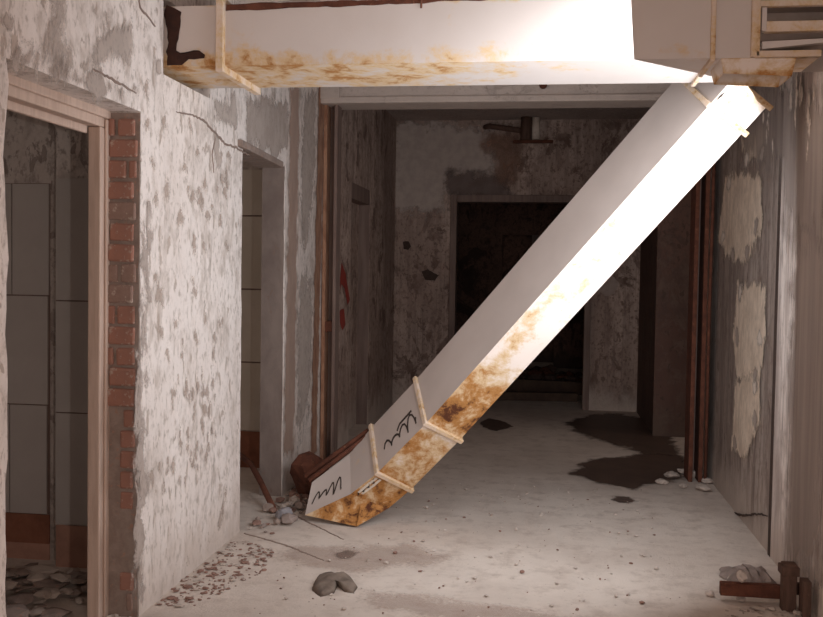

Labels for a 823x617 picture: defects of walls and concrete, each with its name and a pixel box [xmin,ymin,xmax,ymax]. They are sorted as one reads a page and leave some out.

crack [138,0,156,27]
rust [164,5,205,66]
crack [93,68,137,94]
crack [176,111,250,173]
peeling [186,132,232,228]
flaking render [108,113,186,617]
peeling [170,369,216,471]
damp [566,414,685,489]